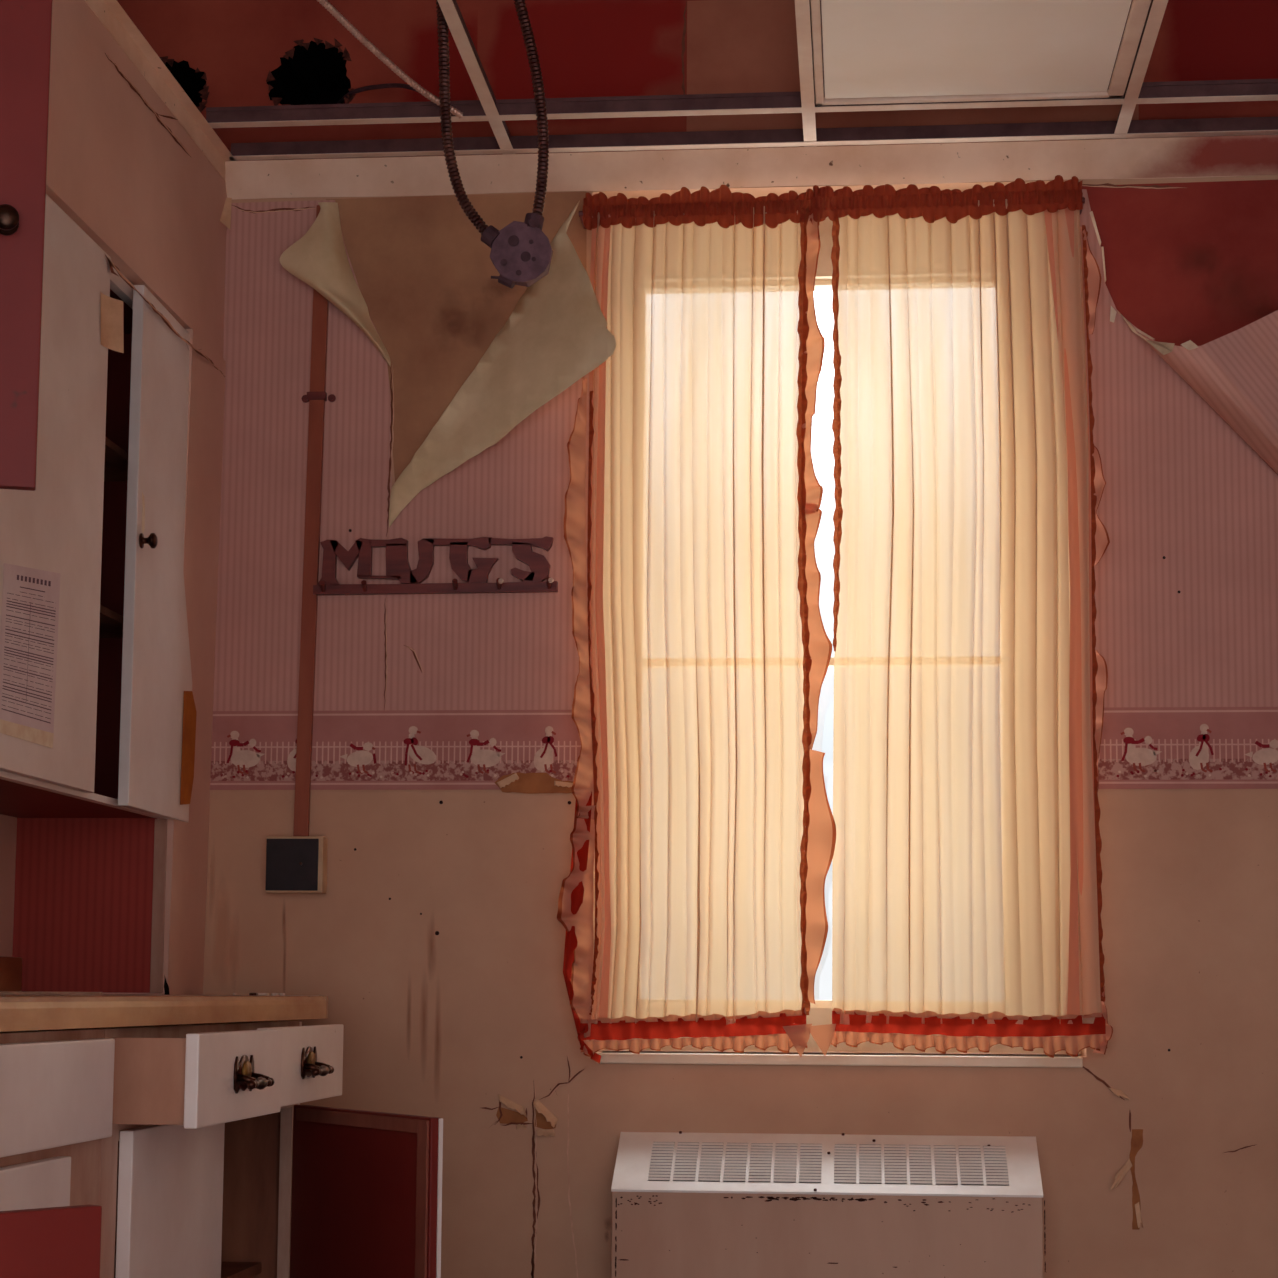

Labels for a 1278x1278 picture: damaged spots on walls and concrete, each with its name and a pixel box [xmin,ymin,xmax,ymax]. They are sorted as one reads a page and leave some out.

hole [159,56,210,113]
hole [266,38,356,106]
flaking render [326,191,587,482]
flaking render [1082,180,1278,346]
crack [531,1057,584,1278]